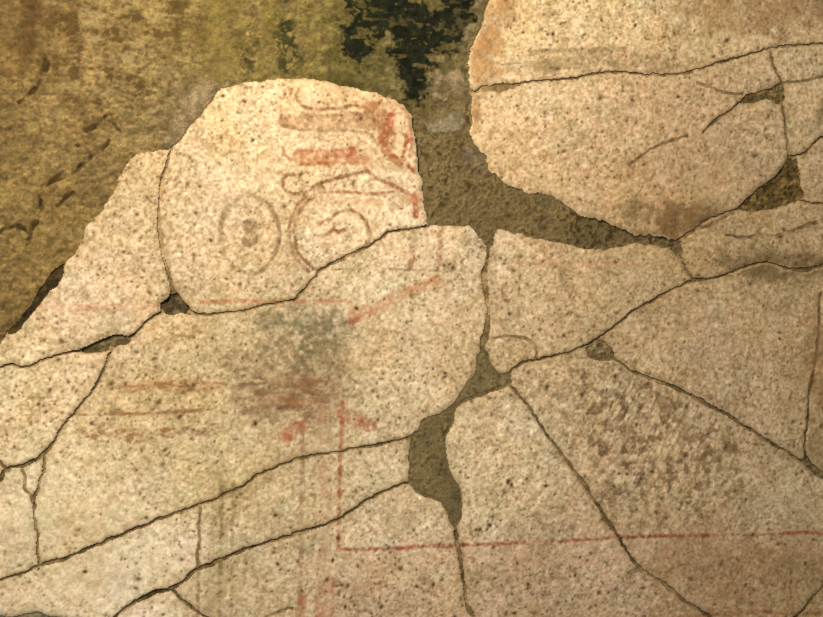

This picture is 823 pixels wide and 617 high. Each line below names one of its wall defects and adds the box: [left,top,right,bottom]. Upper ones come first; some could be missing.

leakage [264,6,302,72]
leakage [329,0,502,108]
crack [468,42,823,166]
spalling [0,0,682,344]
spalling [736,155,803,212]
spalling [81,334,132,353]
crack [0,148,428,617]
leakage [265,308,340,420]
spalling [406,347,513,530]
spalling [582,336,617,361]
crack [480,198,823,617]
crack [453,530,475,617]